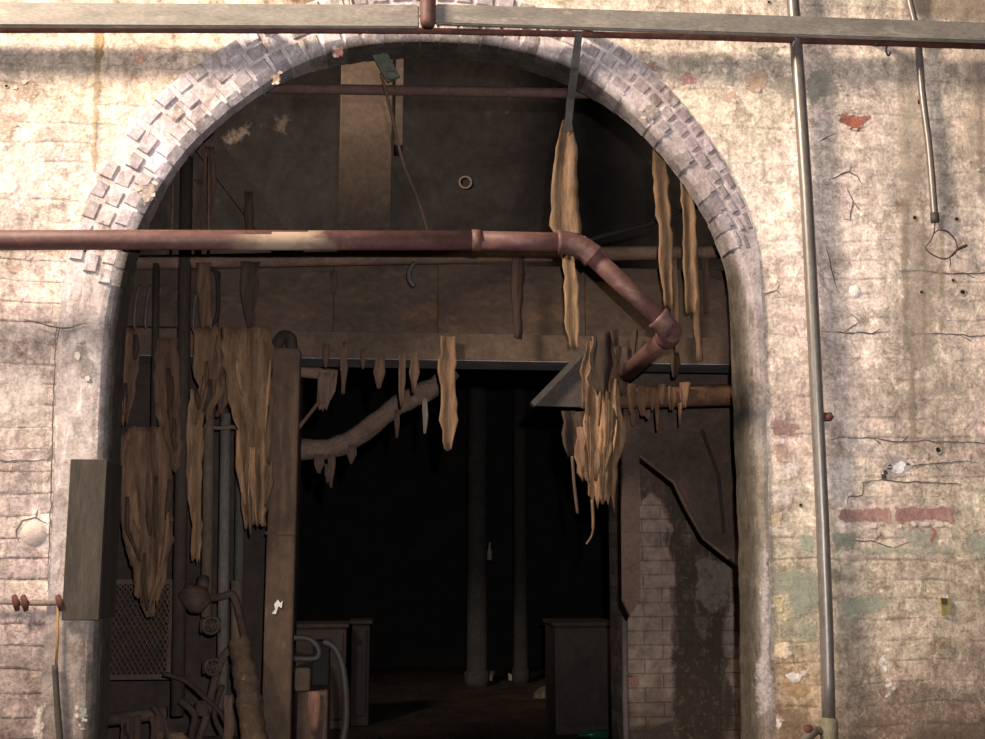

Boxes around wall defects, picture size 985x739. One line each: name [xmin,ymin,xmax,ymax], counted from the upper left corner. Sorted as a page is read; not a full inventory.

crack [829,168,863,220]
peeling [768,420,813,527]
spalling [827,455,954,555]
crack [832,433,985,504]
water stain [632,466,733,739]
water stain [757,549,807,739]
water stain [856,680,985,739]